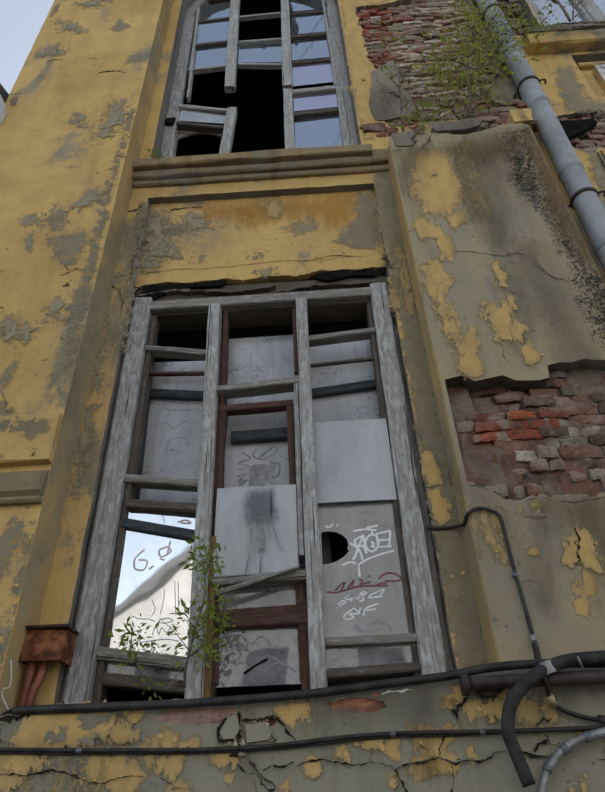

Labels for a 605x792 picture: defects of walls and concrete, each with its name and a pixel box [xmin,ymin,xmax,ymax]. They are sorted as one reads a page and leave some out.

flaking render [355,0,512,122]
peeling [555,64,605,201]
peeling [0,95,136,440]
spalling [137,249,378,300]
crack [456,250,567,281]
damp [498,127,605,344]
peeling [332,171,488,668]
flaking render [447,368,605,519]
crack [0,769,183,789]
flaking render [156,699,238,725]
flaking render [327,688,413,713]
crack [216,697,560,792]